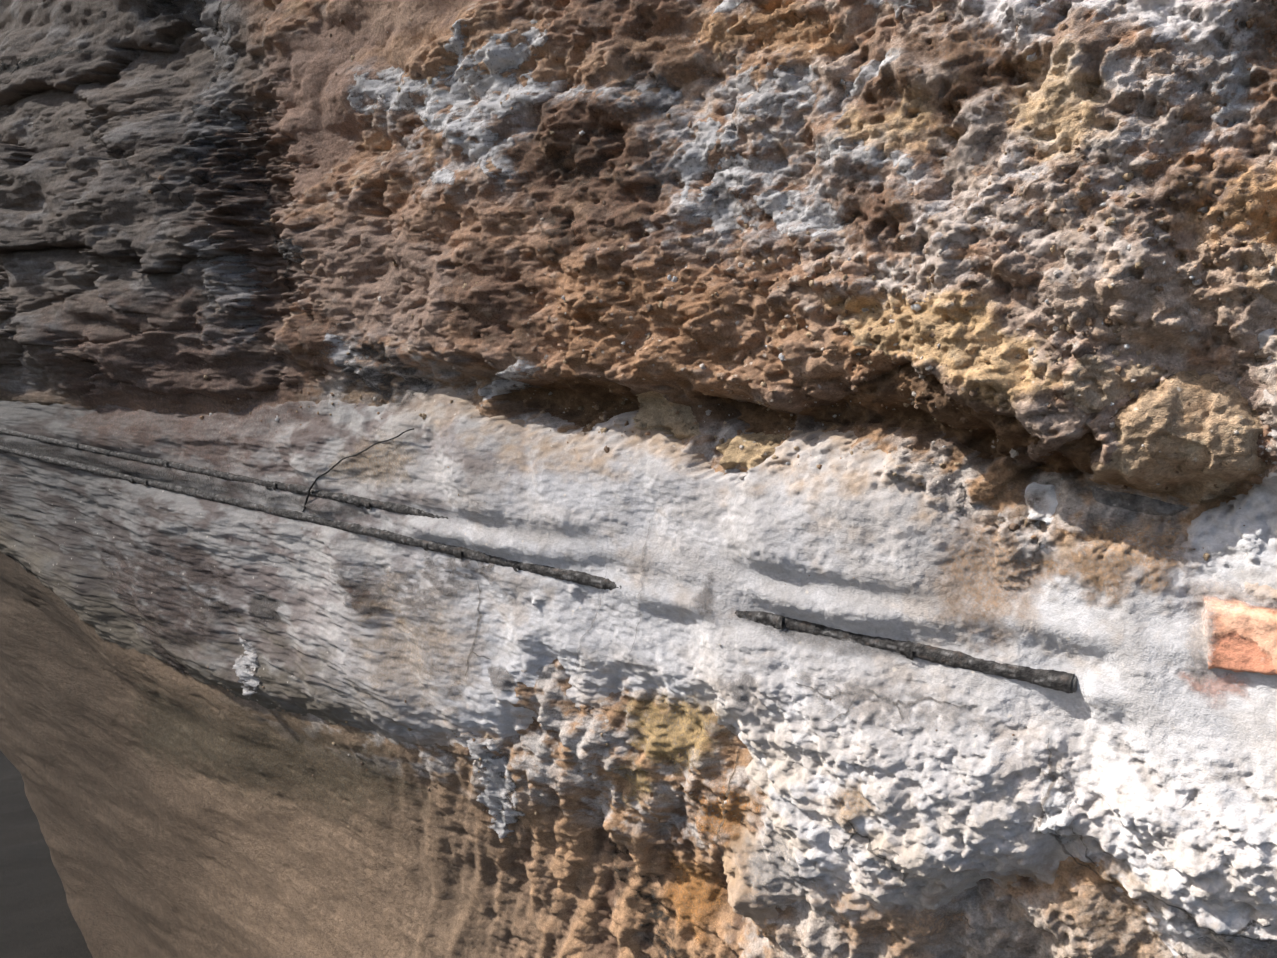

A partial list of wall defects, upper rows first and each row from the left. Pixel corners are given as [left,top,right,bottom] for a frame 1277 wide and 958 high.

spalling [850,9,1028,128]
spalling [495,67,659,243]
spalling [848,163,912,251]
spalling [439,245,540,351]
spalling [719,362,1101,474]
crack [1110,374,1175,419]
damp [459,732,525,839]
damp [609,841,678,958]
damp [748,837,807,900]
crack [841,815,906,888]
crack [1038,738,1100,877]
crack [1156,897,1277,942]